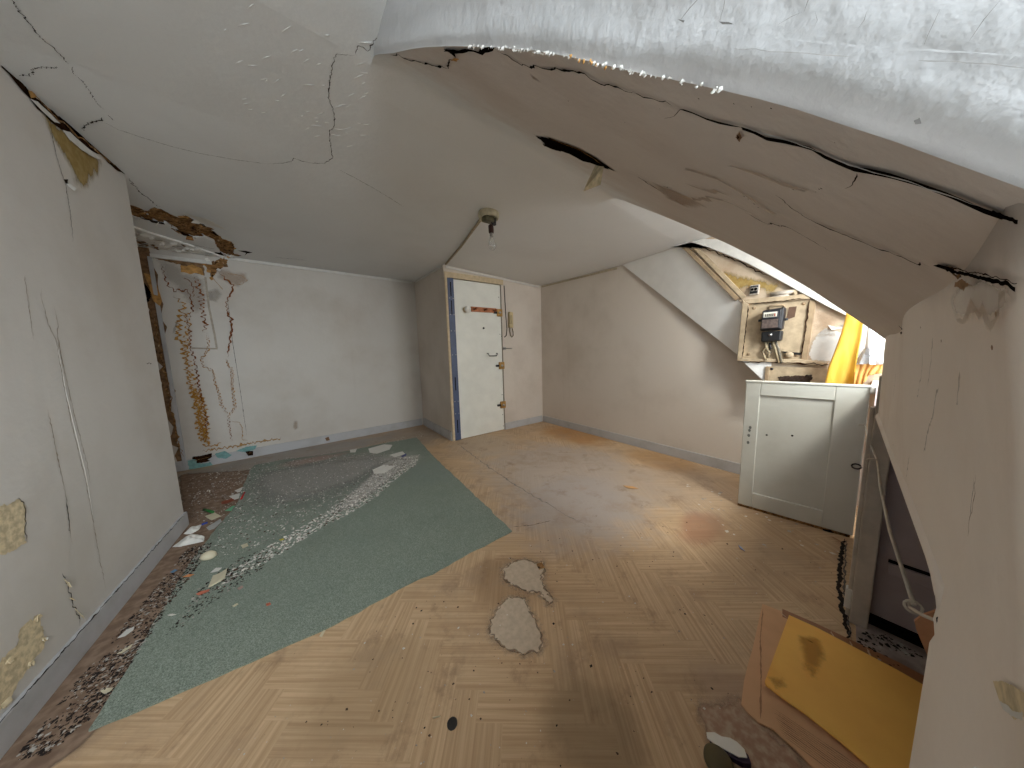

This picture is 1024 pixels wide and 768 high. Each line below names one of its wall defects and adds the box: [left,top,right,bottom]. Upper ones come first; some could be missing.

crack [12,0,393,200]
flaking render [467,44,723,94]
crack [504,54,1018,224]
flaking render [130,205,241,280]
crack [752,197,921,266]
crack [49,417,72,542]
peeling [0,445,257,768]